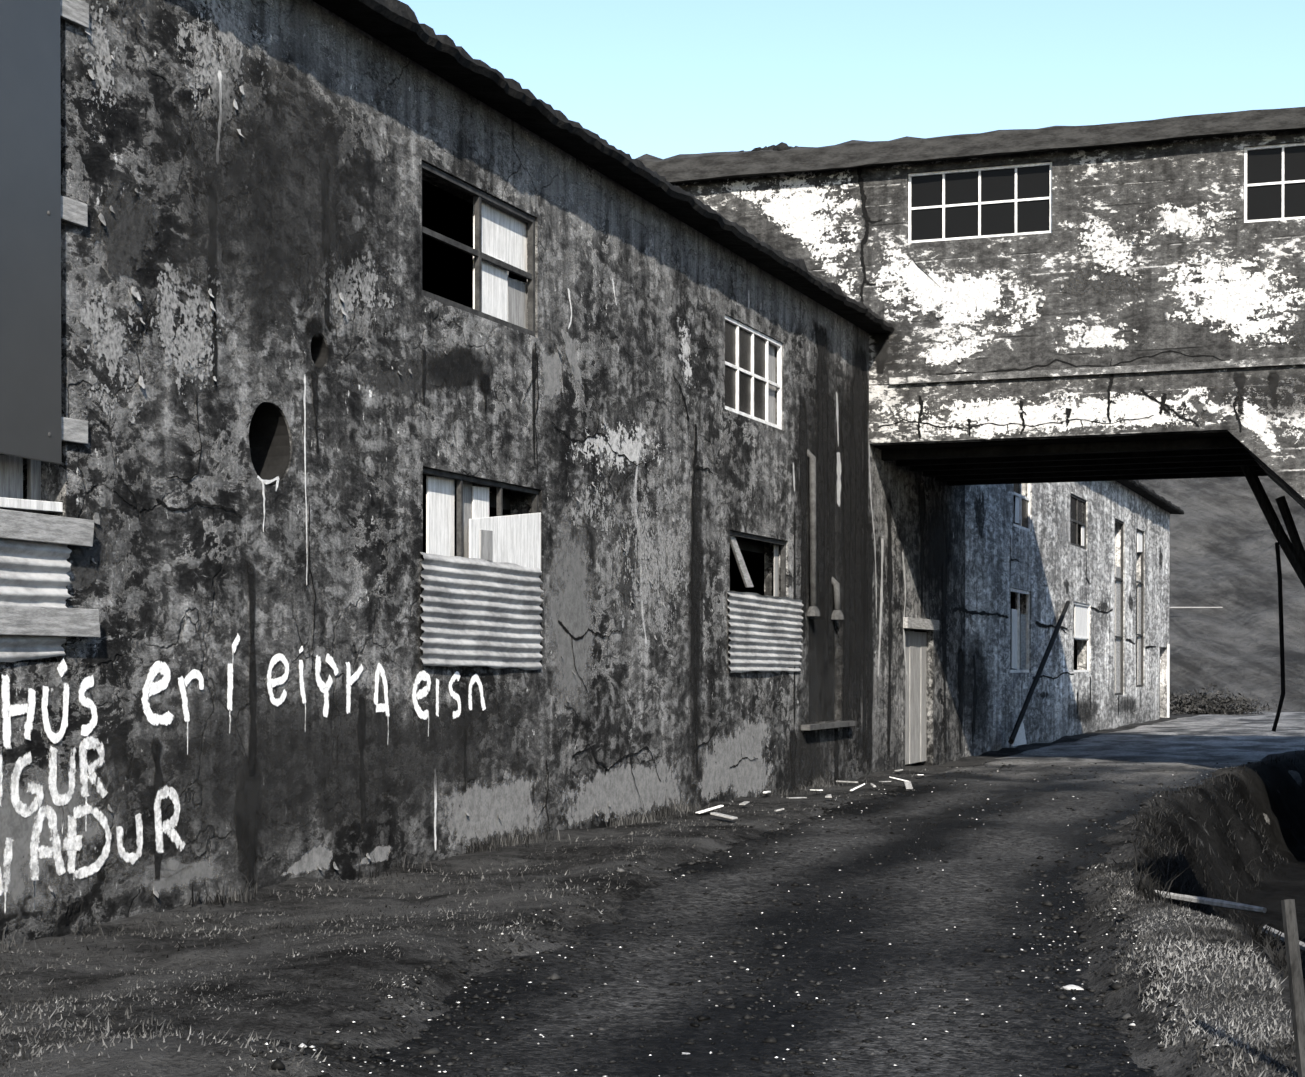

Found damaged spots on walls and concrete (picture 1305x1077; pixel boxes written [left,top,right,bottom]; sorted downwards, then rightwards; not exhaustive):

leakage [178,70,365,389]
crack [857,167,882,302]
peeling [723,170,1305,366]
leakage [257,476,279,532]
leakage [304,371,319,548]
leakage [422,347,489,412]
spalling [974,486,986,544]
crack [878,350,1226,439]
peeling [872,380,1305,459]
crack [1233,396,1245,432]